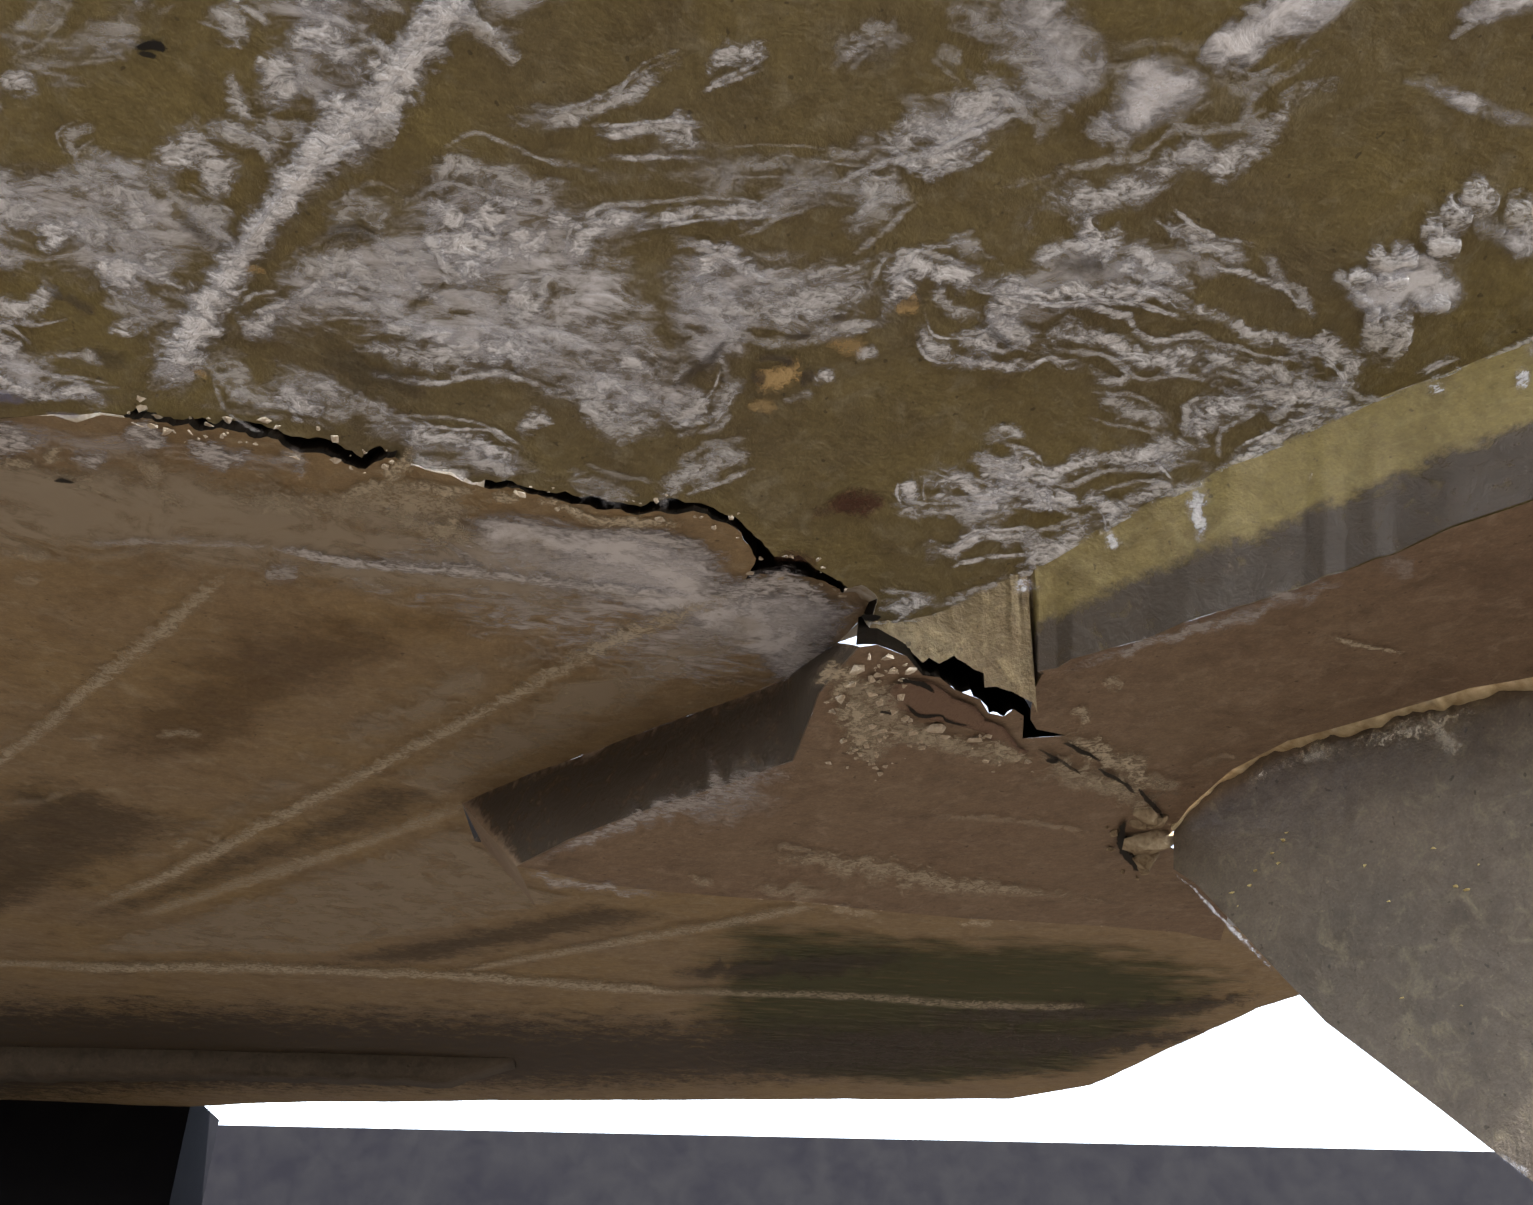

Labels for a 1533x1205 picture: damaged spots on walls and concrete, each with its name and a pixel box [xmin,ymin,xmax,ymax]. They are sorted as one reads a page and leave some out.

damp [1006,0,1105,100]
damp [1097,0,1350,141]
damp [844,79,1018,214]
damp [0,0,775,436]
damp [678,104,1533,581]
crack [124,395,397,473]
crack [484,480,847,597]
damp [1032,420,1533,684]
crack [880,679,966,726]
spalling [824,614,1066,781]
crack [1040,742,1164,871]
spalling [1105,802,1174,880]